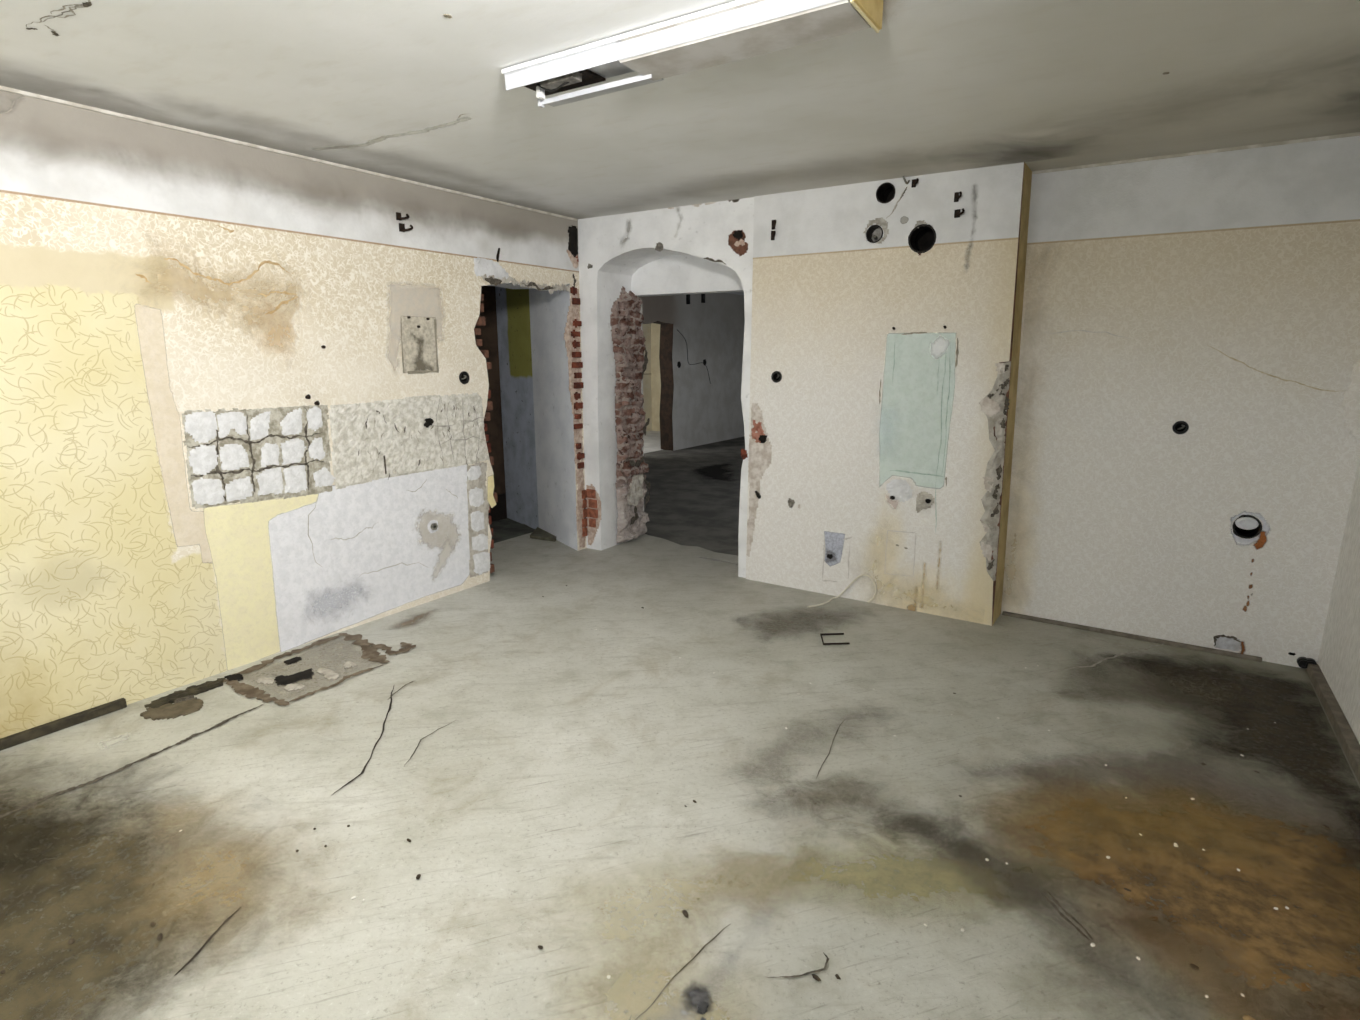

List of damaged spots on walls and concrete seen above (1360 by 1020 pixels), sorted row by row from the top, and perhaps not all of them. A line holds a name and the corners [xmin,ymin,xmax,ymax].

crack [26,0,92,36]
leakage [136,258,298,316]
spalling [567,226,592,269]
flaking render [204,465,470,687]
spalling [474,274,602,573]
spalling [980,361,1011,581]
corrosion [1243,531,1267,612]
leakage [0,770,255,1020]